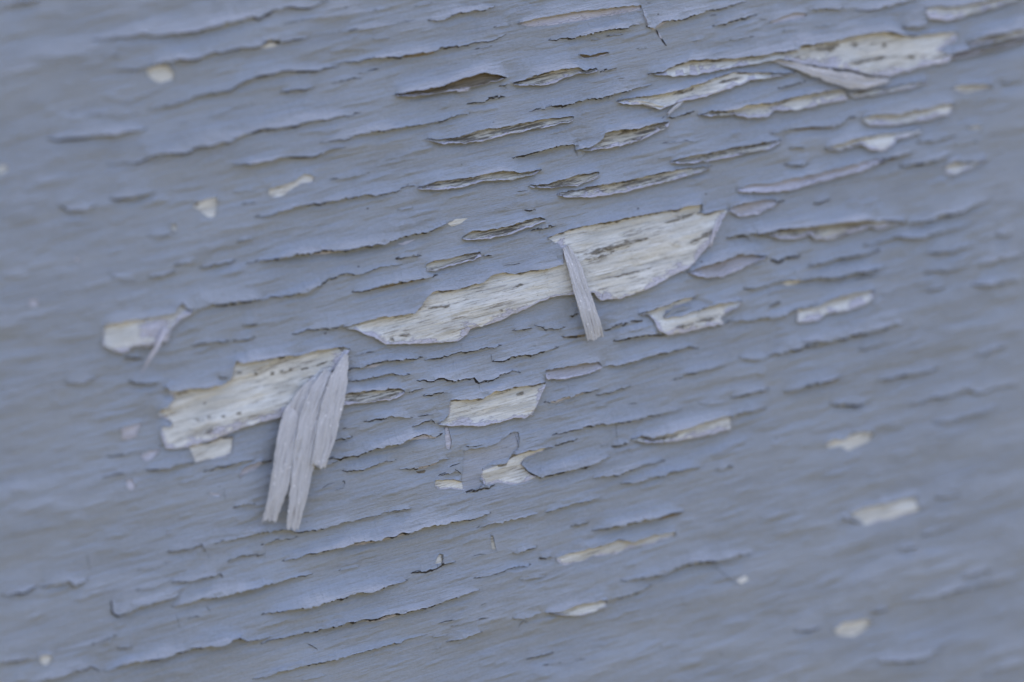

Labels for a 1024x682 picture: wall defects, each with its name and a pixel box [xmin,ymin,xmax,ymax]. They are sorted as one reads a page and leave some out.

peeling [116,0,1024,532]
peeling [90,281,263,374]
peeling [550,517,684,568]